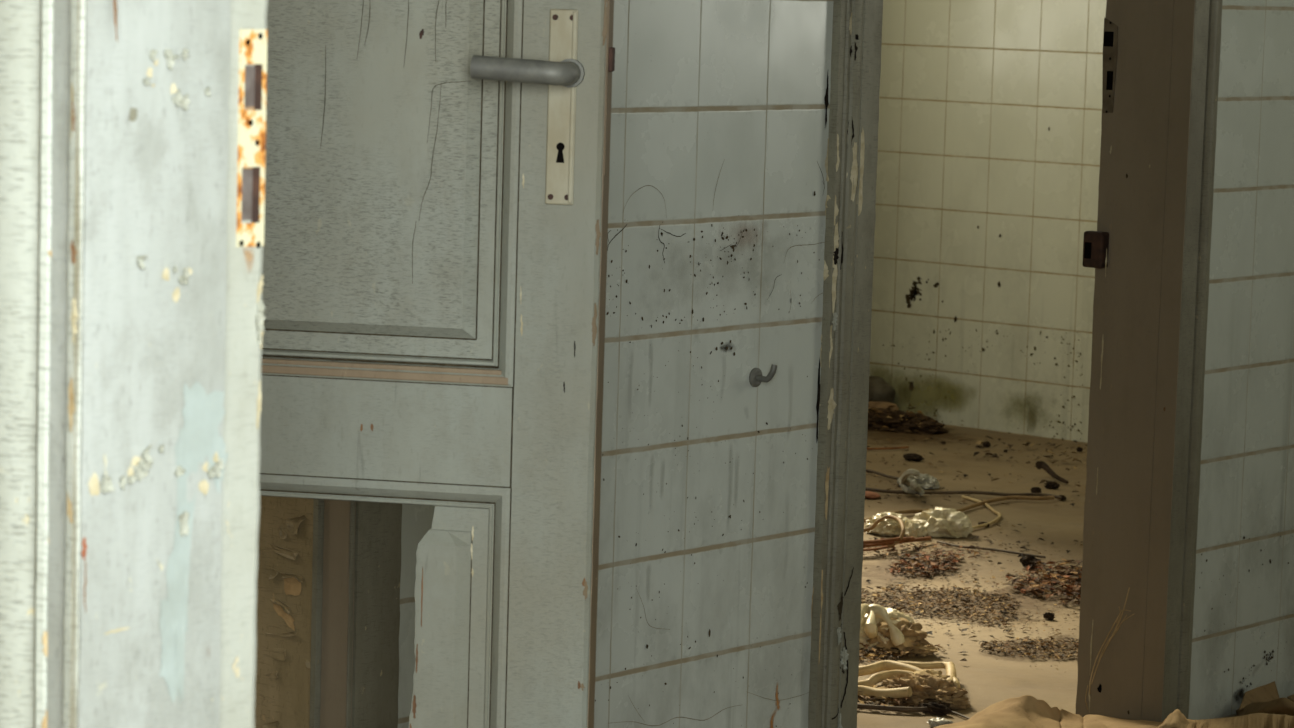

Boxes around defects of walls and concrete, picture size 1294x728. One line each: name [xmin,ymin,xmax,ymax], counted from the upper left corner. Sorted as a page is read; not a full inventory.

peeling [88,445,165,496]
peeling [174,452,224,495]
crack [831,567,854,728]
crack [614,692,807,726]